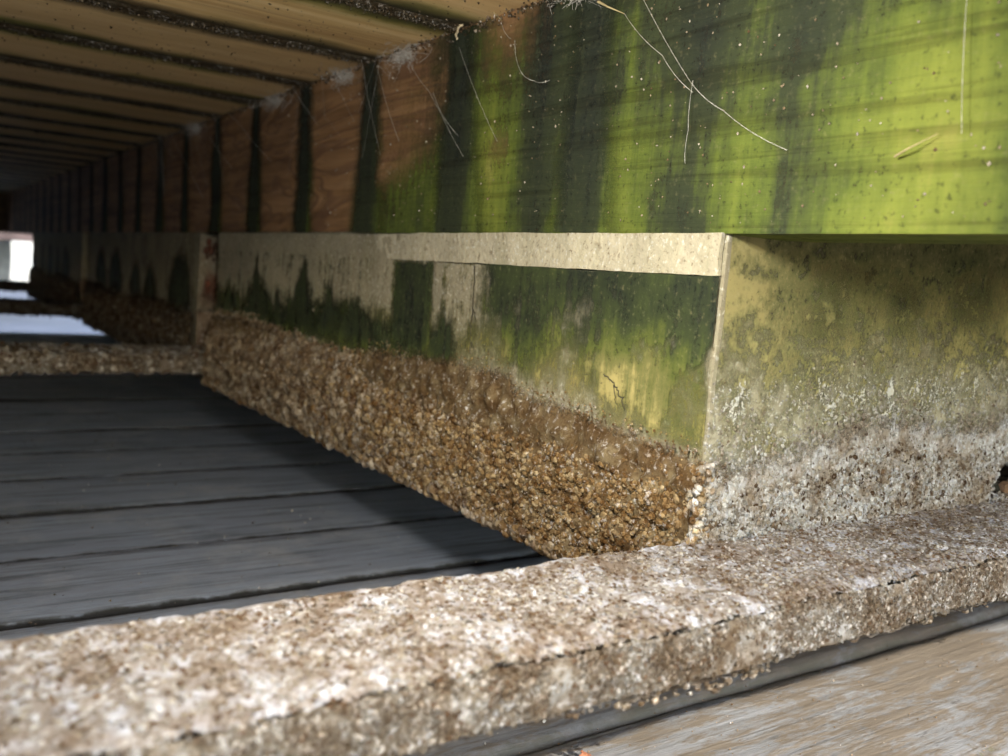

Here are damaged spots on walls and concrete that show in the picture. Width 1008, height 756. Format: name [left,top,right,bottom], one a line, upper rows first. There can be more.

leakage [429,26,482,232]
leakage [548,0,616,233]
leakage [222,255,456,364]
leakage [713,381,778,430]
leakage [786,368,1008,421]